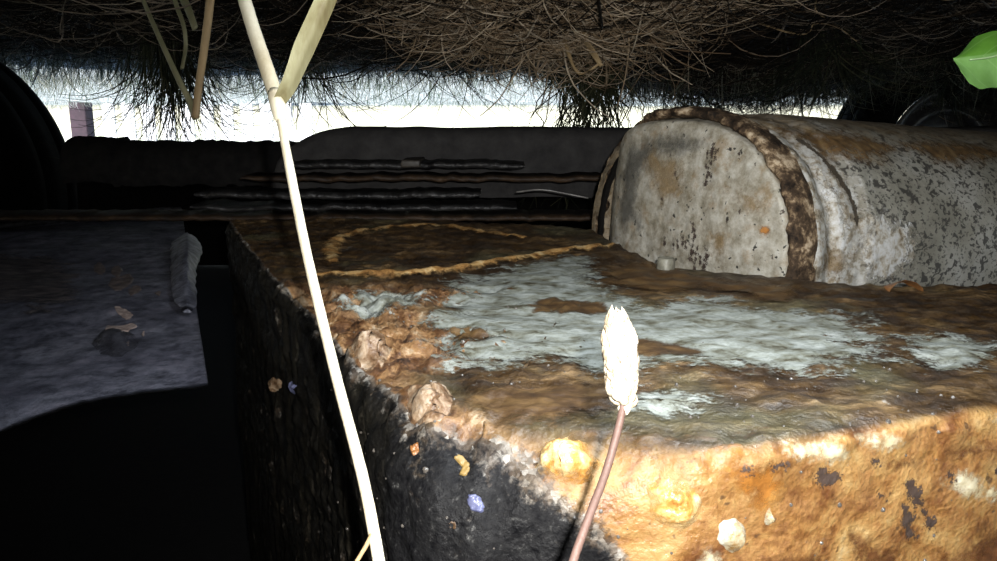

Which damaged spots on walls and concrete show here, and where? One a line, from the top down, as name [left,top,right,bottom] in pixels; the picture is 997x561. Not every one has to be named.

corrosion [464,380,676,446]
corrosion [728,466,780,510]
spalling [812,465,844,489]
spalling [900,478,937,542]
corrosion [850,534,894,561]
corrosion [943,528,997,561]